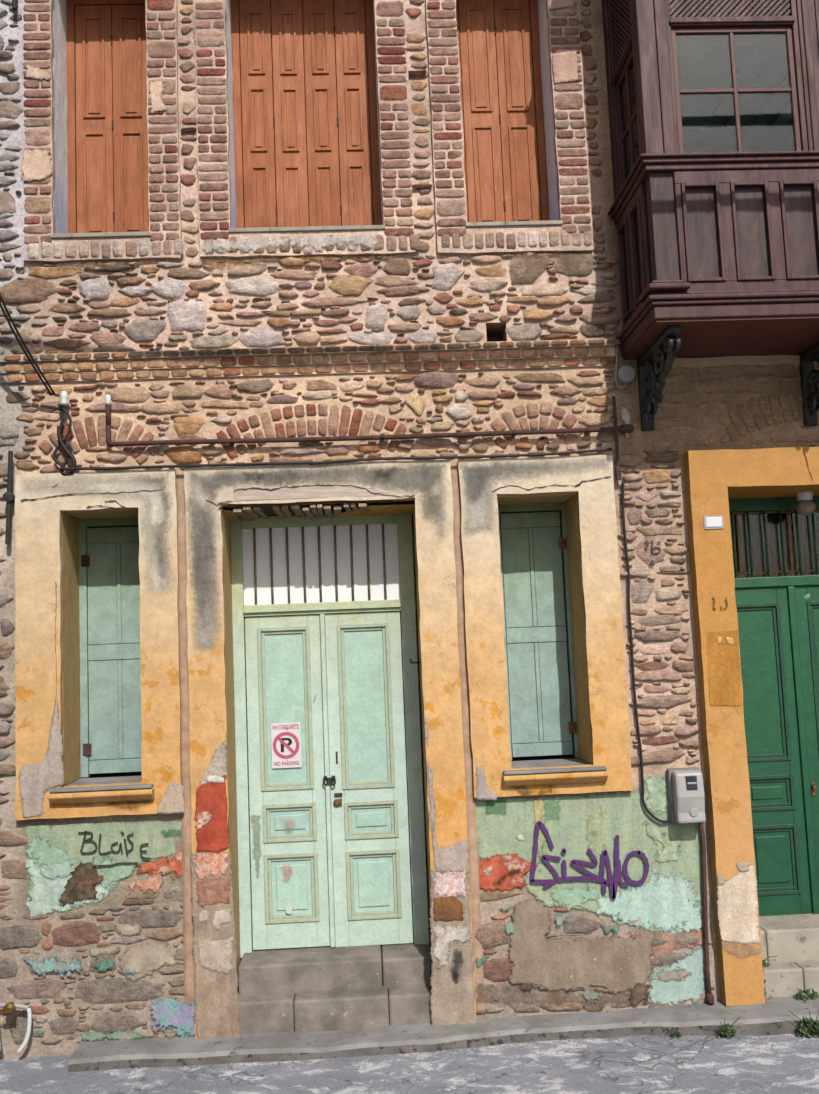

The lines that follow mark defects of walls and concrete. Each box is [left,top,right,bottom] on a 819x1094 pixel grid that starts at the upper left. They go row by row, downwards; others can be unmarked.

crack [21,484,163,509]
damp [26,478,170,590]
damp [190,465,445,648]
damp [465,460,606,531]
peeling [18,698,241,1042]
peeling [424,718,760,1026]